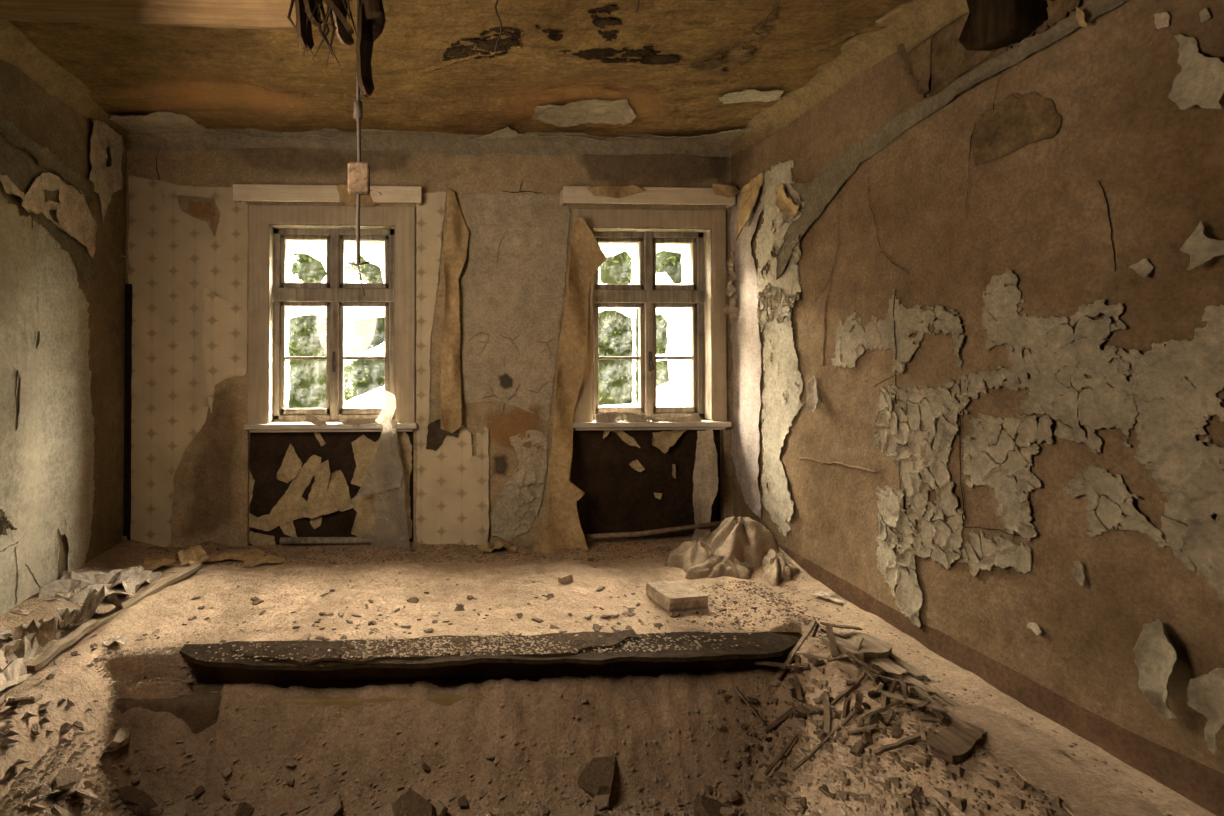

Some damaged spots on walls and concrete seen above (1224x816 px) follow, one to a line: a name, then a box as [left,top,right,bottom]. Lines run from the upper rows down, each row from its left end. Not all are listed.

spalling [535,5,680,65]
peeling [1154,12,1224,110]
flaking render [471,98,752,145]
peeling [755,0,1129,537]
peeling [1180,221,1224,270]
crack [799,170,910,490]
peeling [0,192,95,639]
peeling [249,432,416,552]
peeling [603,430,686,479]
peeling [831,268,1224,628]
peeling [1133,619,1177,720]
peeling [1187,668,1224,754]